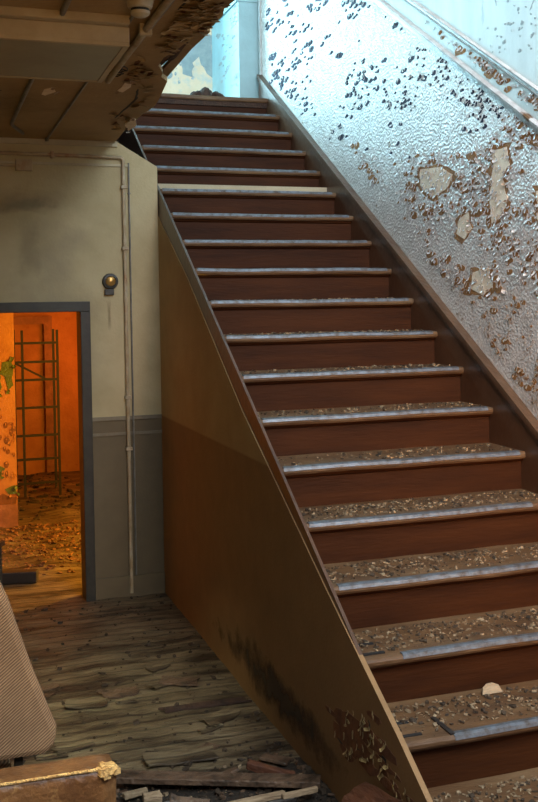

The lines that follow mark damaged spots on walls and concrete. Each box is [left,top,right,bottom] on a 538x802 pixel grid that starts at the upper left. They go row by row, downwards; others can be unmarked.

peeling [265,0,343,116]
peeling [338,0,376,24]
peeling [425,0,538,111]
peeling [0,357,16,397]
peeling [512,359,538,409]
peeling [0,409,20,511]